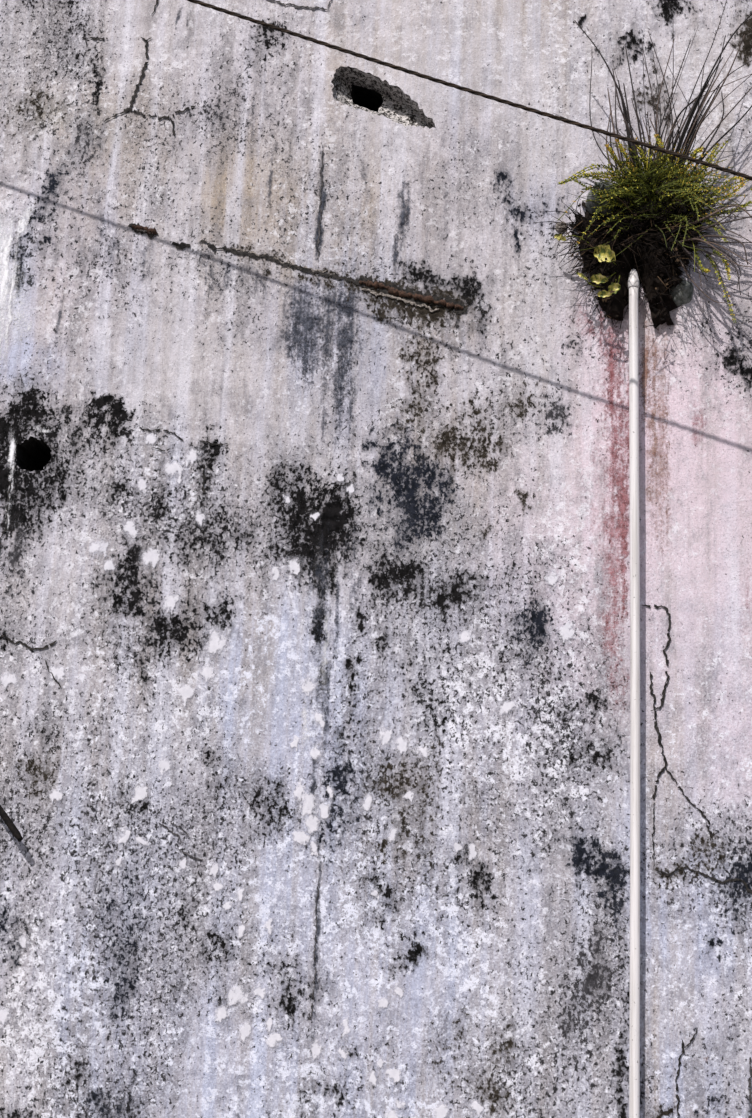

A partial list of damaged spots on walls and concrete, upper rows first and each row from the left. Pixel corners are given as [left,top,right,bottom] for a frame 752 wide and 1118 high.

crack [104,0,196,136]
water stain [720,0,752,66]
water stain [314,151,327,255]
rust [359,280,464,310]
water stain [715,338,752,388]
rust [589,312,668,661]
water stain [0,170,575,1030]
water stain [489,559,625,774]
crack [642,604,752,894]
water stain [645,822,752,964]
crack [675,1028,698,1118]
crack [744,1057,752,1118]